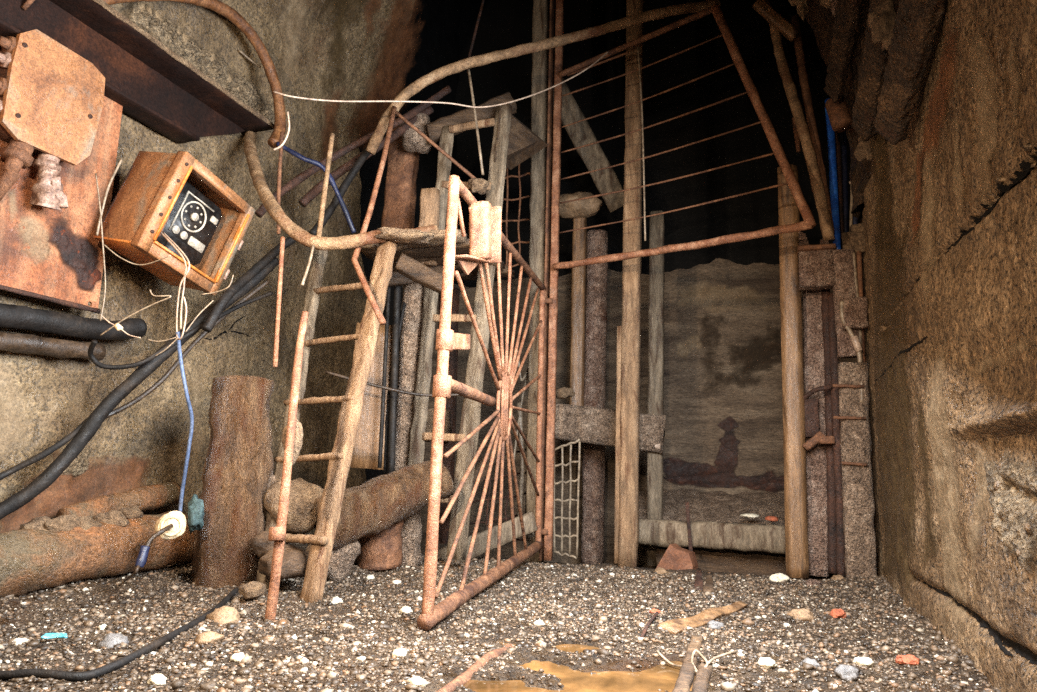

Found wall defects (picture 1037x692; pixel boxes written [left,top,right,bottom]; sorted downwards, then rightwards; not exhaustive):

corrosion [0,96,123,314]
crack [904,142,1037,297]
crack [875,336,927,385]
crack [914,576,1037,664]